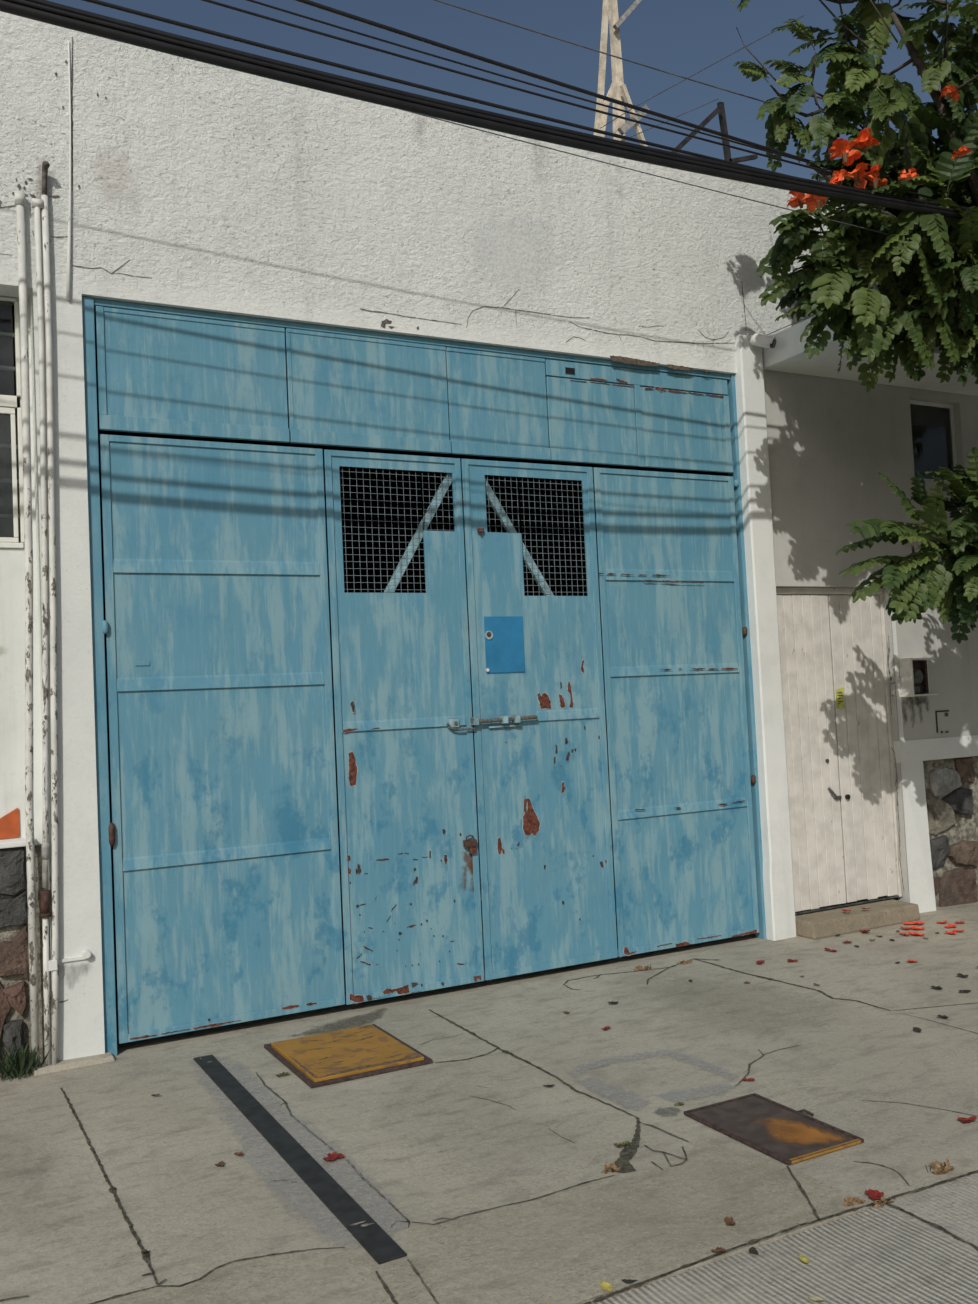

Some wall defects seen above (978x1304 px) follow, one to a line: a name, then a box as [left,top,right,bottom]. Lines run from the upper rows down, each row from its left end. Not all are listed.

crack [361,281,746,344]
crack [61,1088,345,1304]
crack [375,1259,439,1304]
crack [256,1072,614,1228]
crack [420,1009,689,1170]
crack [734,1045,799,1087]
crack [563,958,978,1034]
crack [583,1161,978,1304]